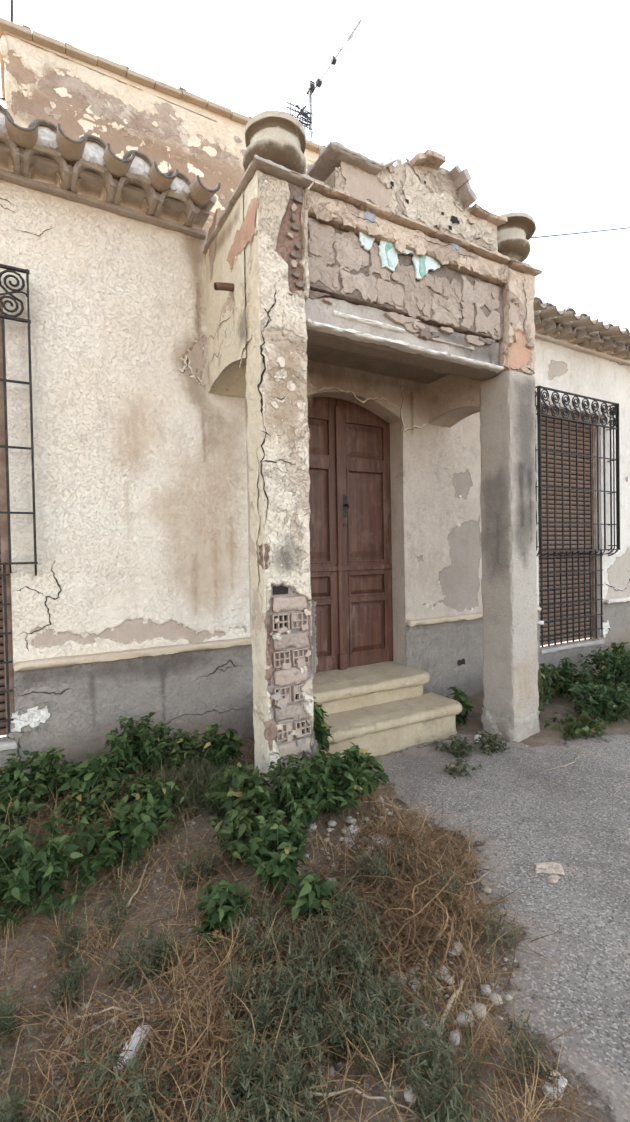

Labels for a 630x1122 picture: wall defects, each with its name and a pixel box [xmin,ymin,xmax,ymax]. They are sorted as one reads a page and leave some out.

flaking render [3,50,258,281]
flaking render [276,161,535,373]
flaking render [260,339,307,409]
flaking render [294,513,309,528]
flaking render [606,546,630,599]
flaking render [31,618,247,648]
crack [199,654,247,677]
flaking render [6,702,50,739]